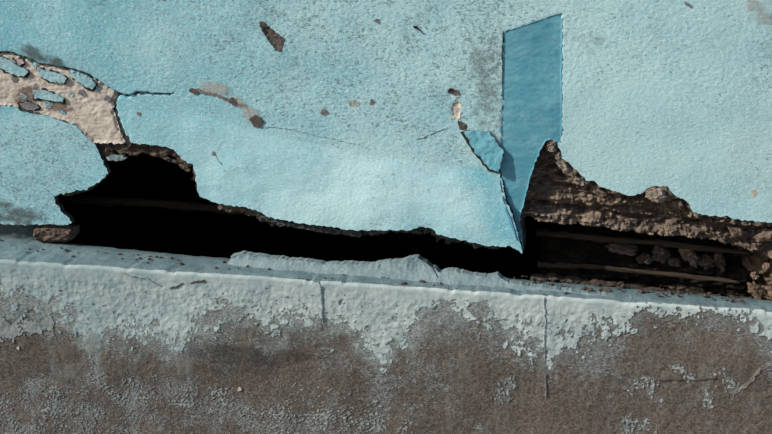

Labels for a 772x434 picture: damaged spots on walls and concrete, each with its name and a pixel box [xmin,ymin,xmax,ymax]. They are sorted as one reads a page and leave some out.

peeling [259,21,285,52]
spalling [0,53,772,374]
peeling [0,363,417,434]
peeling [491,376,516,405]
peeling [622,377,664,403]
peeling [703,368,740,409]
peeling [615,413,657,434]